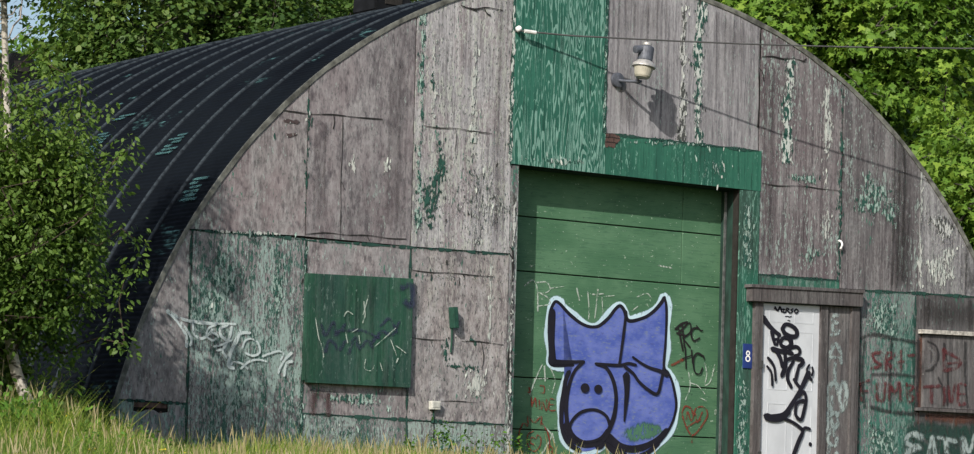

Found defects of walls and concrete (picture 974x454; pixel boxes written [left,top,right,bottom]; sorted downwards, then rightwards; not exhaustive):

peeling [602,0,733,190]
peeling [776,57,903,281]
peeling [414,0,584,454]
peeling [205,229,281,315]
peeling [267,250,288,316]
peeling [862,299,908,336]
peeling [863,419,900,454]